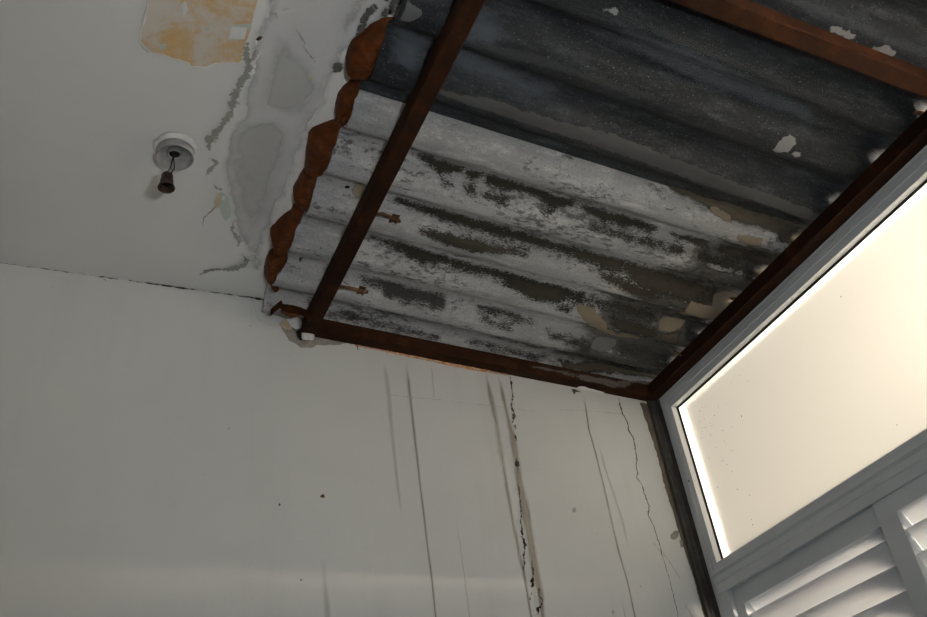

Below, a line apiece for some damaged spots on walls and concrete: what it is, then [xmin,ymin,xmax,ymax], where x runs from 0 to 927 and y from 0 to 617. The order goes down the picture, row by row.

peeling [138,0,258,69]
crack [5,42,264,300]
mould [328,309,440,341]
corrosion [355,345,508,375]
mould [359,197,716,366]
mould [417,153,774,281]
damp [408,379,436,617]
crack [393,376,543,615]
damp [488,385,532,617]
crack [560,398,693,617]